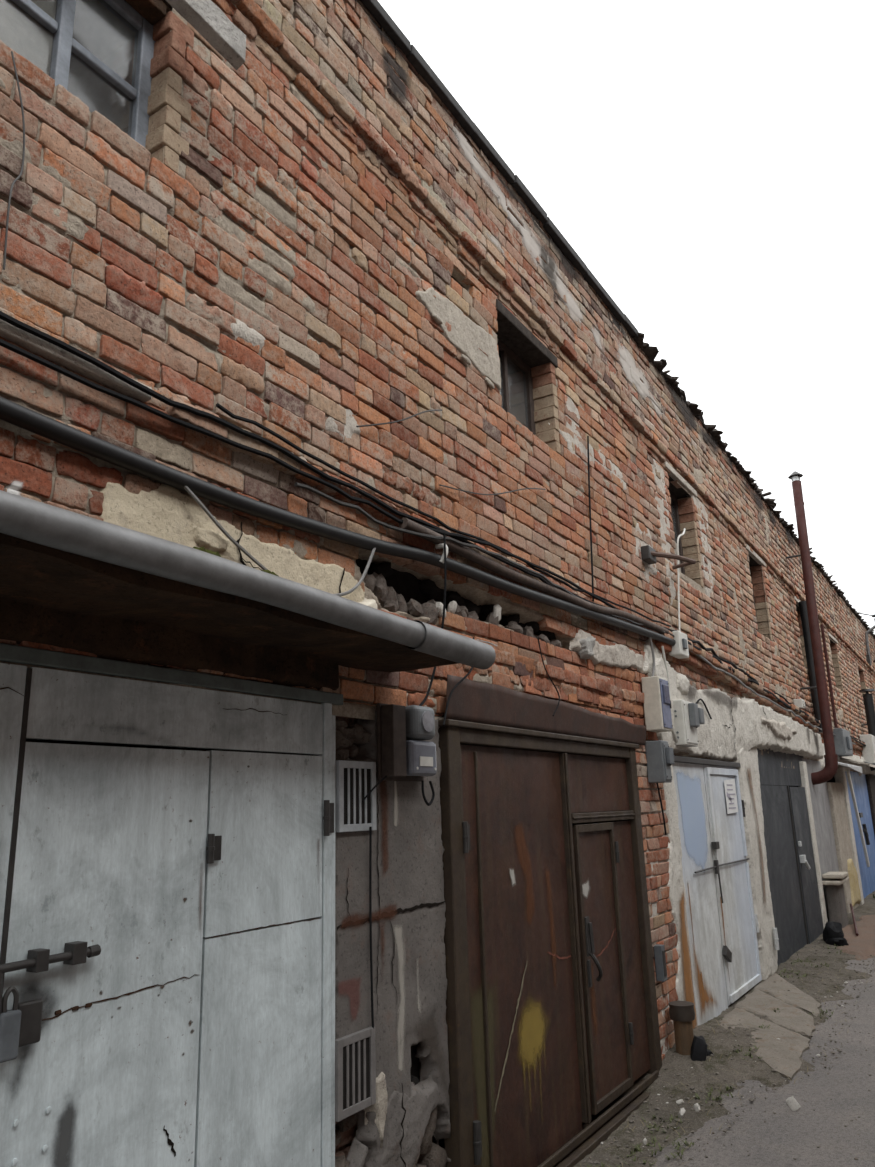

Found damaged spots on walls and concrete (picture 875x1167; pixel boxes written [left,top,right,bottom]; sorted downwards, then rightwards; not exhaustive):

flaking render [99,482,663,673]
crack [42,974,196,1021]
crack [207,767,445,1008]
rust [680,886,713,1029]